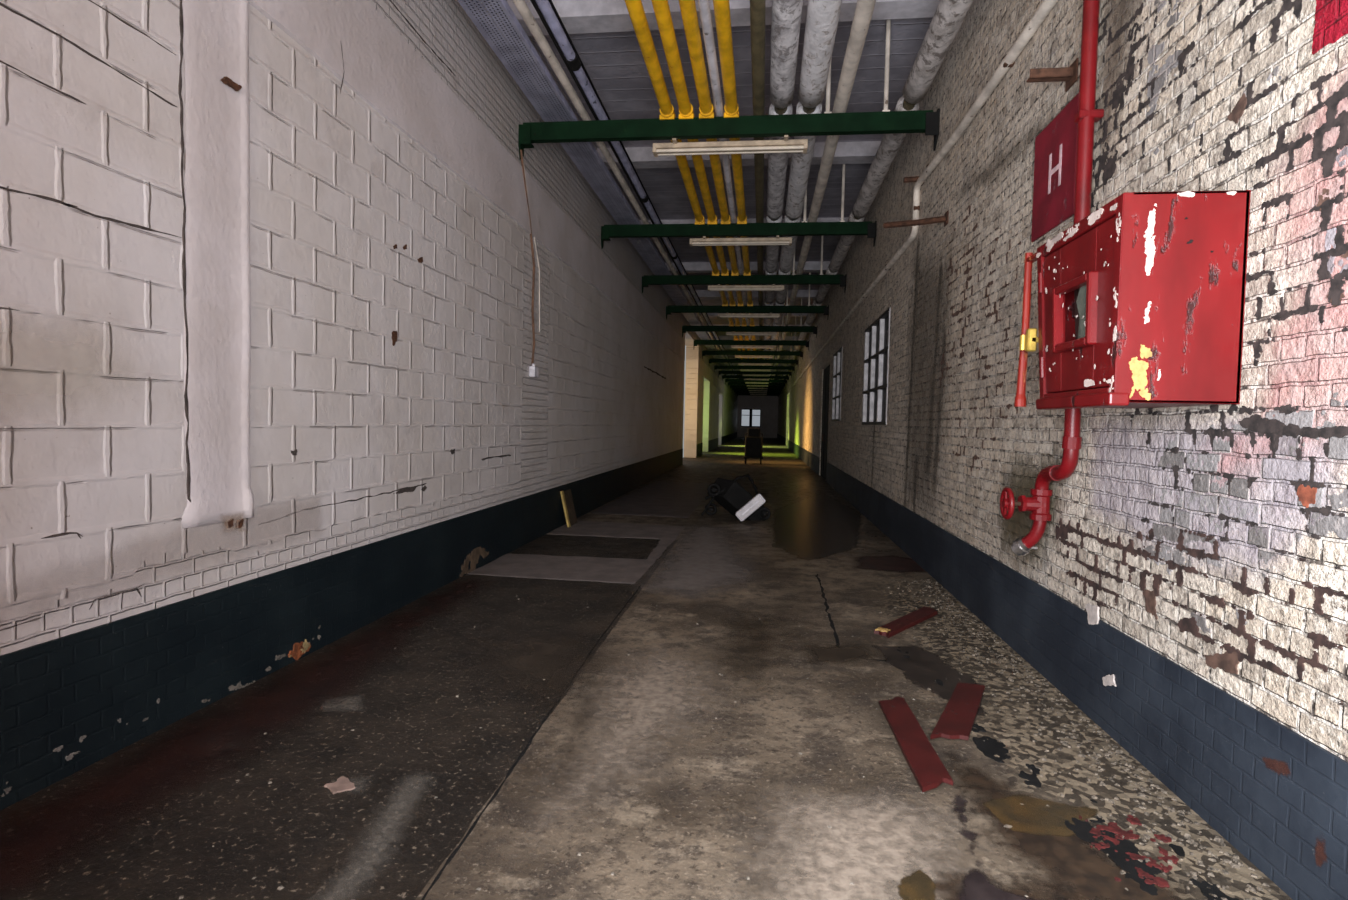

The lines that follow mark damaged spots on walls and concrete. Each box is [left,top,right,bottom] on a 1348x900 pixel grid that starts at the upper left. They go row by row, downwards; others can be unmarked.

peeling [1091,0,1348,366]
peeling [53,735,86,761]
peeling [228,625,321,691]
peeling [1055,392,1348,682]